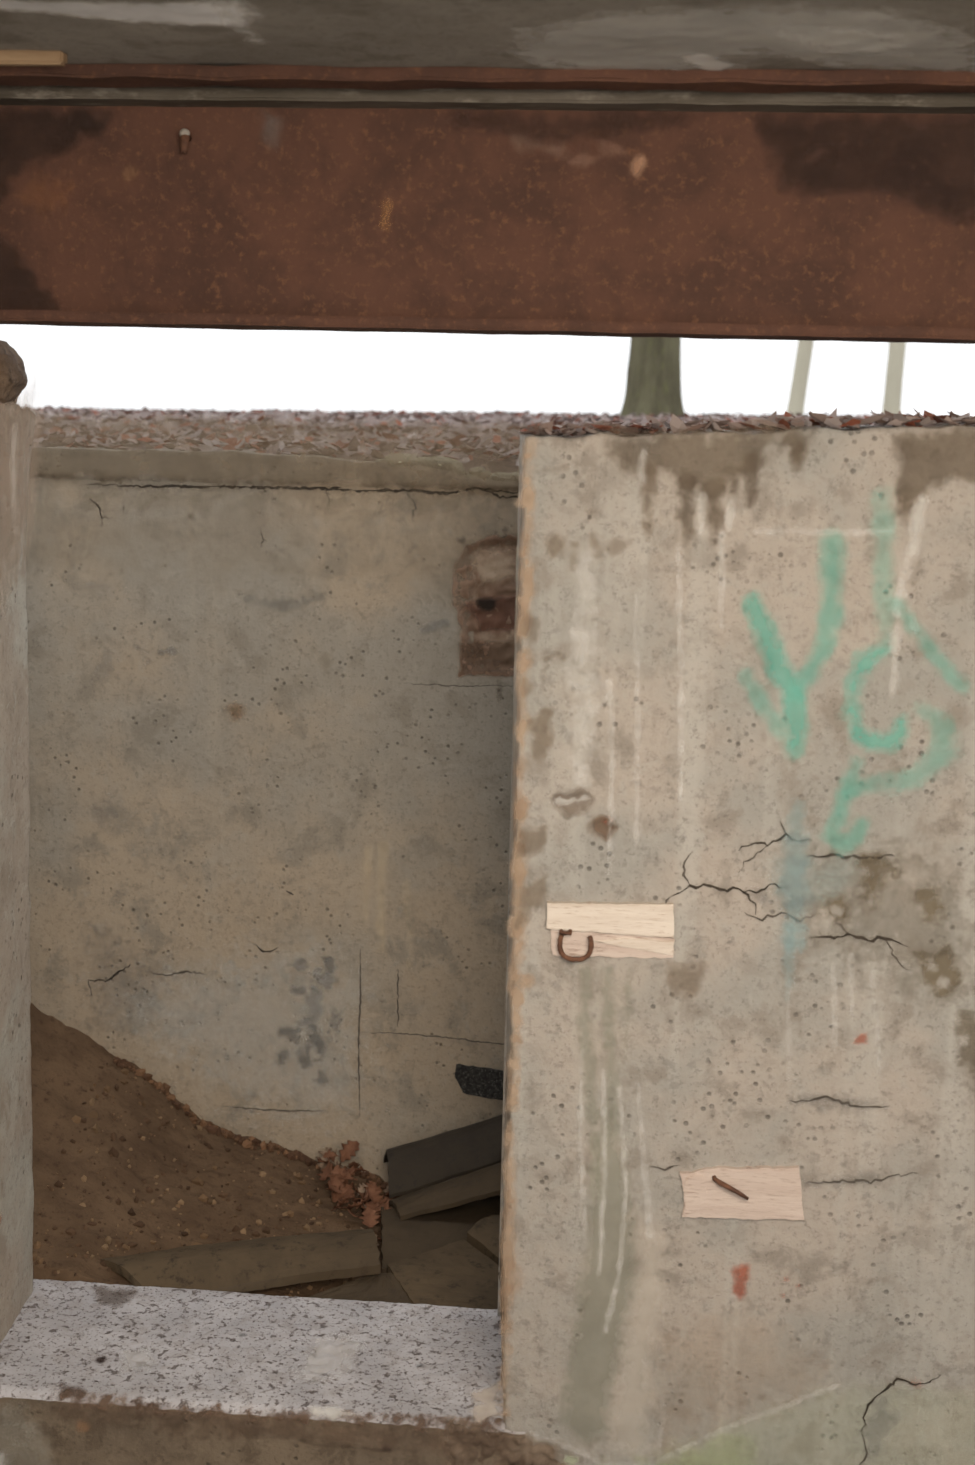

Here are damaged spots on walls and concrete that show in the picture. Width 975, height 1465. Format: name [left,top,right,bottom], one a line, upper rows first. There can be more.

corrosion [0,111,110,200]
corrosion [0,243,58,310]
water stain [613,430,806,536]
water stain [898,429,975,510]
spalling [452,528,517,677]
crack [665,821,909,970]
corrosion [733,1266,748,1296]
crack [859,1374,941,1465]